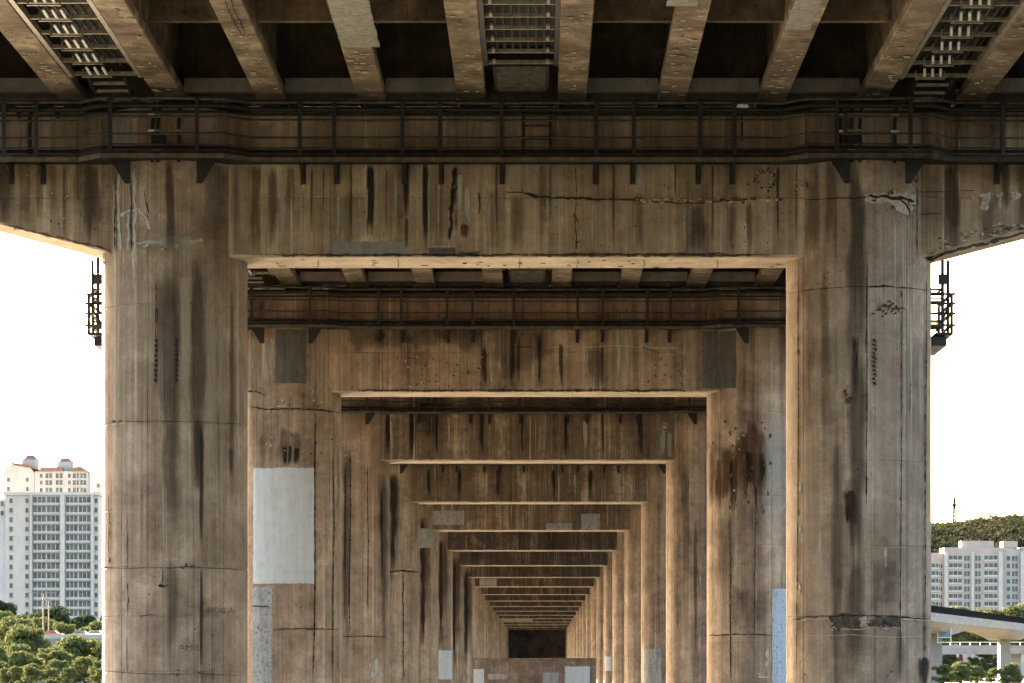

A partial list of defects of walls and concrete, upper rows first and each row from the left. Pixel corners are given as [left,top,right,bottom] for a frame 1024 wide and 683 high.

damp [116,167,173,279]
damp [448,168,481,240]
crack [506,168,648,268]
damp [849,176,864,334]
spalling [864,179,940,218]
peeling [971,190,1021,211]
damp [155,288,177,482]
damp [194,421,203,539]
damp [316,451,349,592]
damp [746,453,764,505]
damp [846,371,864,526]
spalling [828,613,900,631]